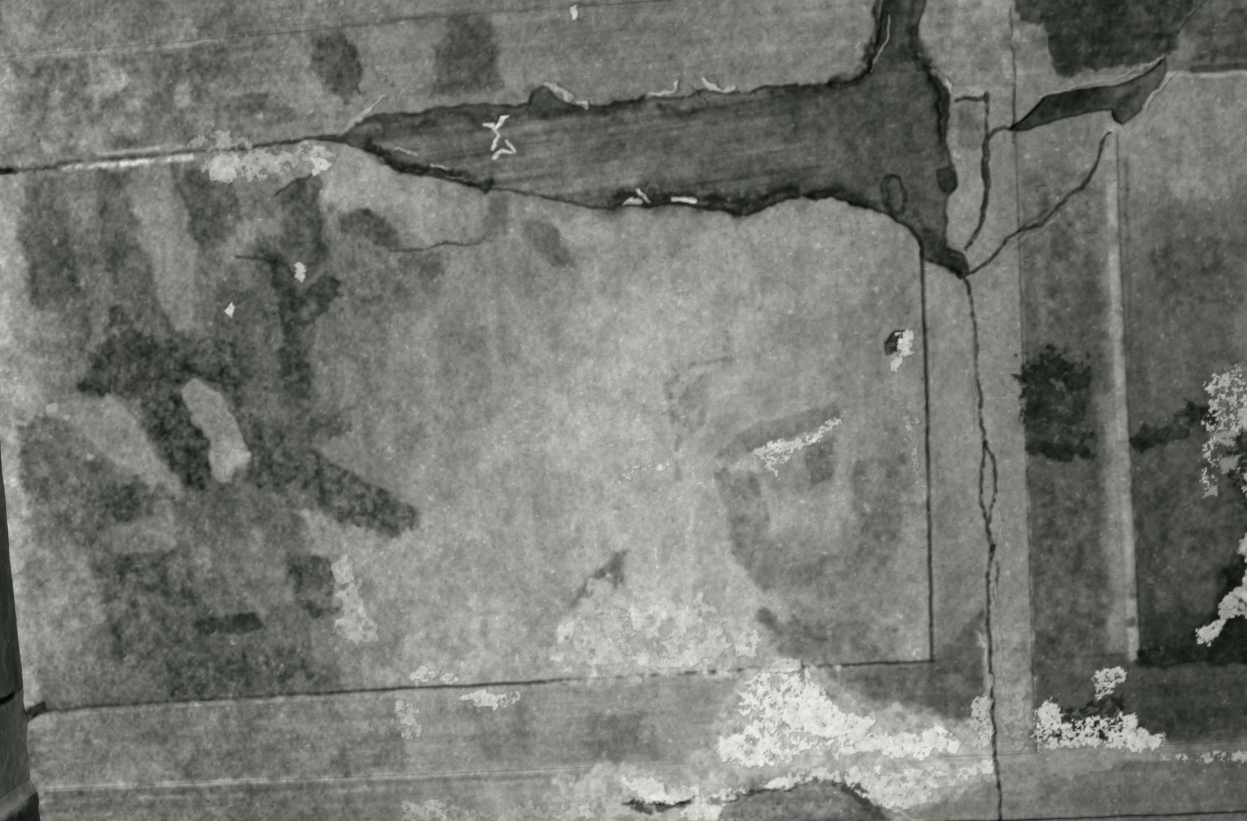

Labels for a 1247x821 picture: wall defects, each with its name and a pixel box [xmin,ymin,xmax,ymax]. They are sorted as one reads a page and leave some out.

spalling [323,0,973,279]
spalling [1009,57,1177,131]
leakage [1043,0,1183,77]
leakage [294,262,306,283]
spalling [885,331,905,354]
crack [955,50,1111,821]
leakage [1012,344,1093,462]
leakage [1130,364,1247,510]
leakage [332,553,379,645]
leakage [1145,532,1247,669]
leakage [395,700,423,740]
leakage [402,574,1247,821]